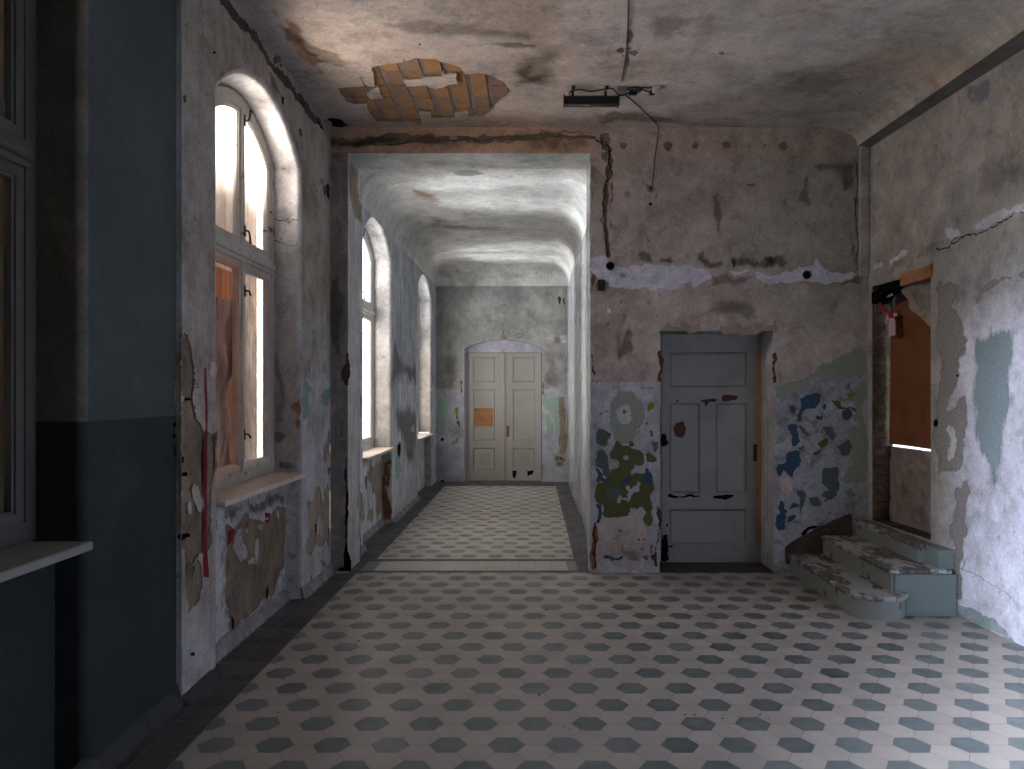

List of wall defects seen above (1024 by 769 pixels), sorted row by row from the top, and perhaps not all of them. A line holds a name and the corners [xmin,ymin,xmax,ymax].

water stain [286,22,322,72]
crack [219,0,613,258]
peeling [338,58,511,124]
peeling [589,255,712,291]
water stain [639,252,672,263]
water stain [698,252,787,268]
crack [936,211,1024,251]
peeling [172,333,218,613]
peeling [589,390,686,571]
flaking render [772,282,906,531]
peeling [933,282,1014,642]
peeling [225,505,286,633]